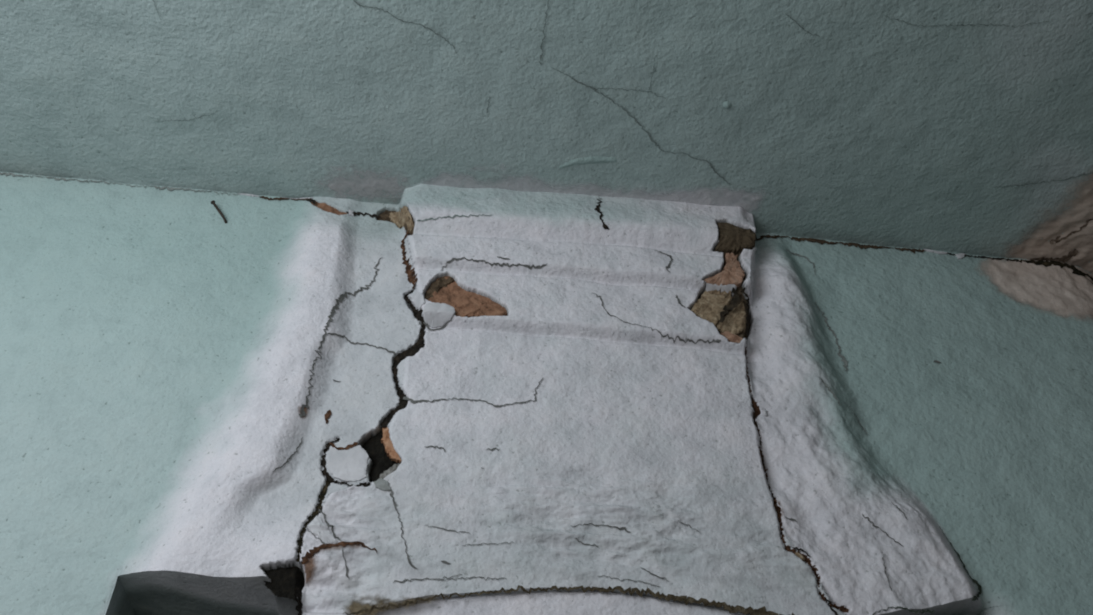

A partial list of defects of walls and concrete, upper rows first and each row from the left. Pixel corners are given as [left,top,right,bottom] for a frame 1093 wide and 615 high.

crack [0,172,309,200]
crack [346,210,380,218]
spalling [425,276,507,317]
spalling [691,223,756,343]
crack [755,219,1093,284]
crack [273,214,794,615]
spalling [362,427,401,491]
crack [594,293,935,615]
spalling [264,566,305,601]
crack [940,528,982,601]